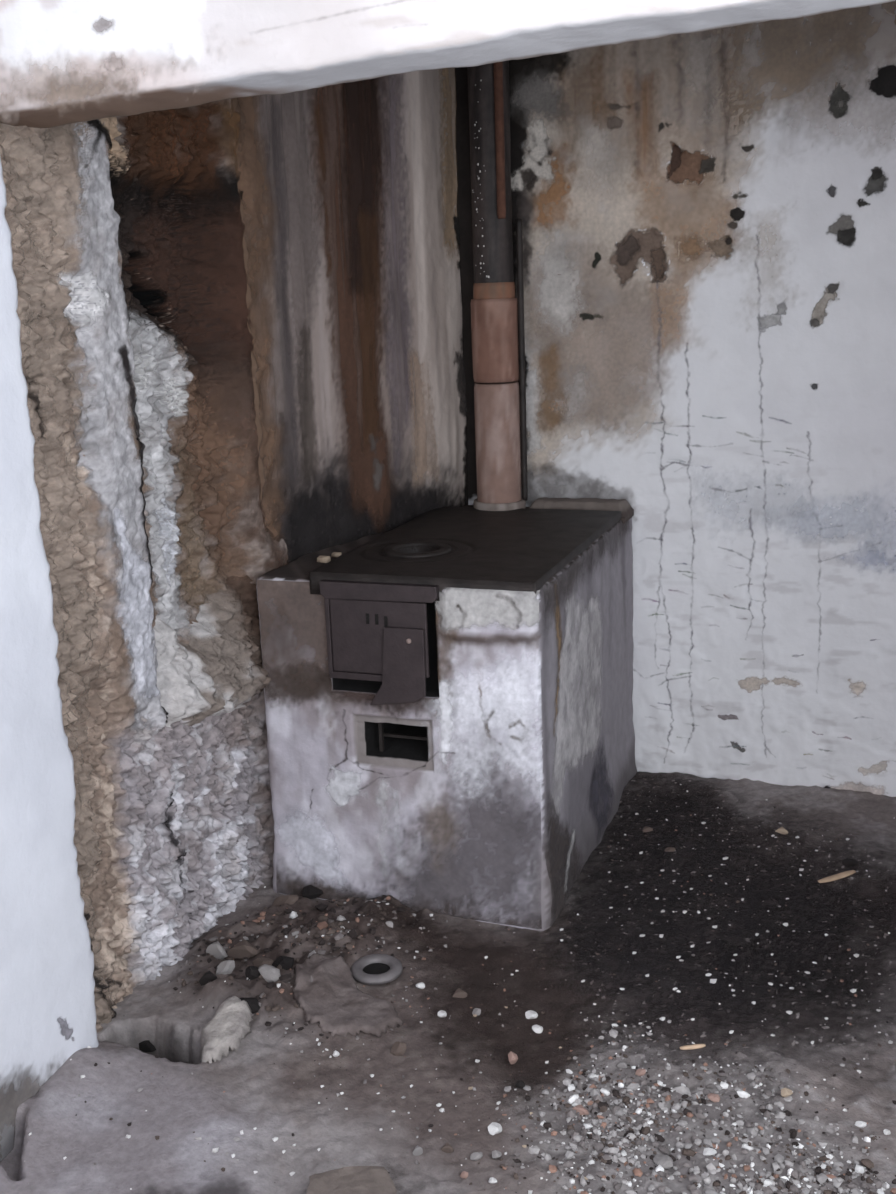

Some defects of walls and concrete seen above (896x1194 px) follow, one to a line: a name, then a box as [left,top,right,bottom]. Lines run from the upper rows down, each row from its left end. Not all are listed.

spalling [829,84,850,118]
spalling [869,65,896,98]
spalling [667,142,715,184]
water stain [342,78,380,443]
spalling [592,228,668,286]
water stain [516,1,896,474]
spalling [680,192,747,259]
spalling [827,167,888,247]
water stain [236,96,315,542]
spalling [810,284,839,327]
peeling [2,116,192,746]
spalling [73,766,112,1038]